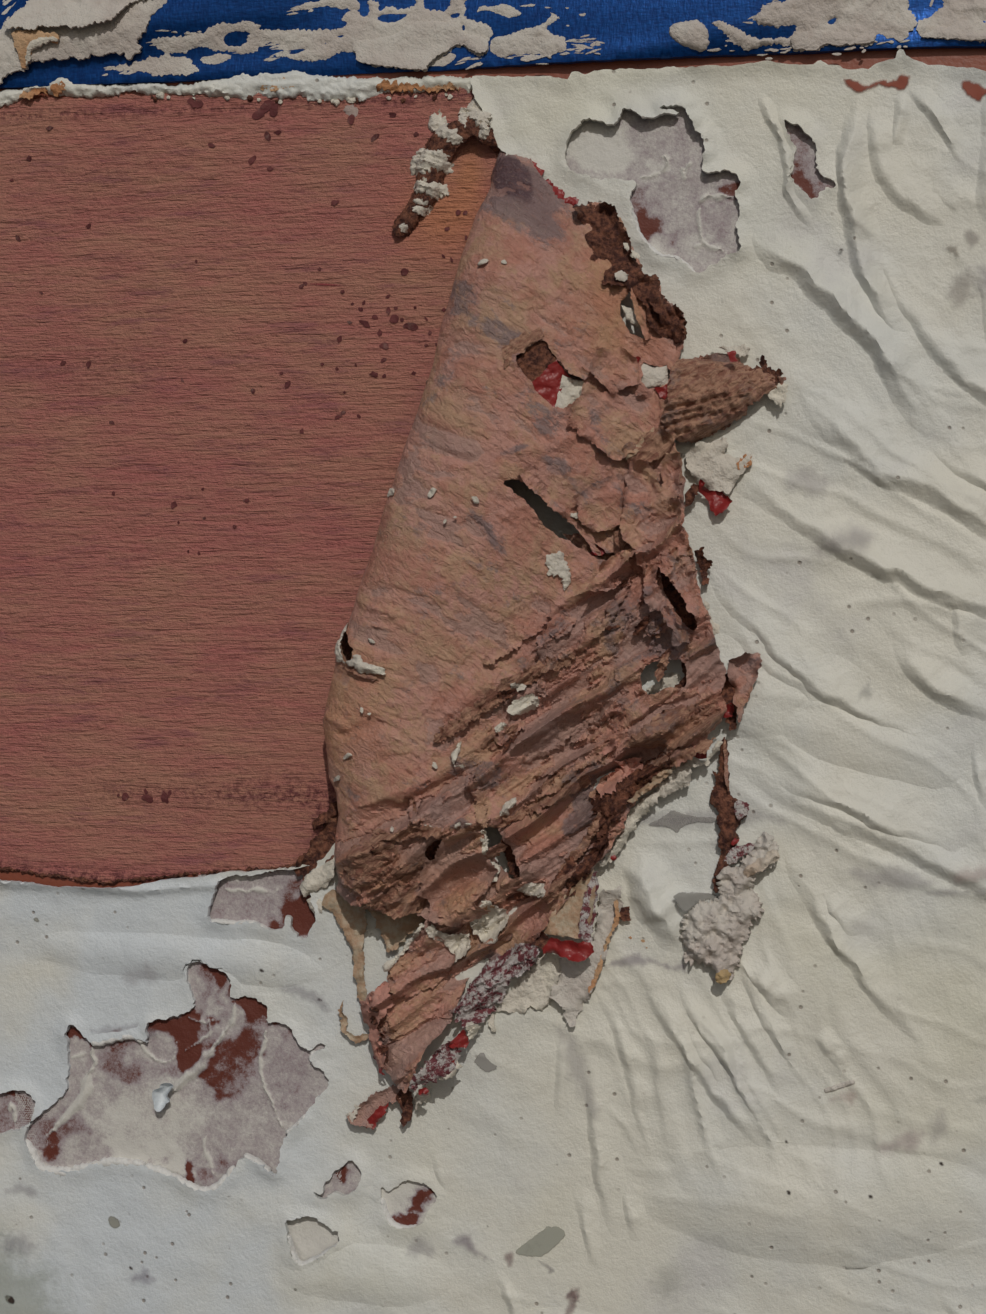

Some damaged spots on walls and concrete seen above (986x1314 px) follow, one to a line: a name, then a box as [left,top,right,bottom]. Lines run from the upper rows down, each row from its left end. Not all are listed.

spalling [669,19,710,52]
peeling [198,106,788,1129]
peeling [0,961,329,1192]
peeling [317,1161,361,1198]
peeling [380,1180,437,1229]